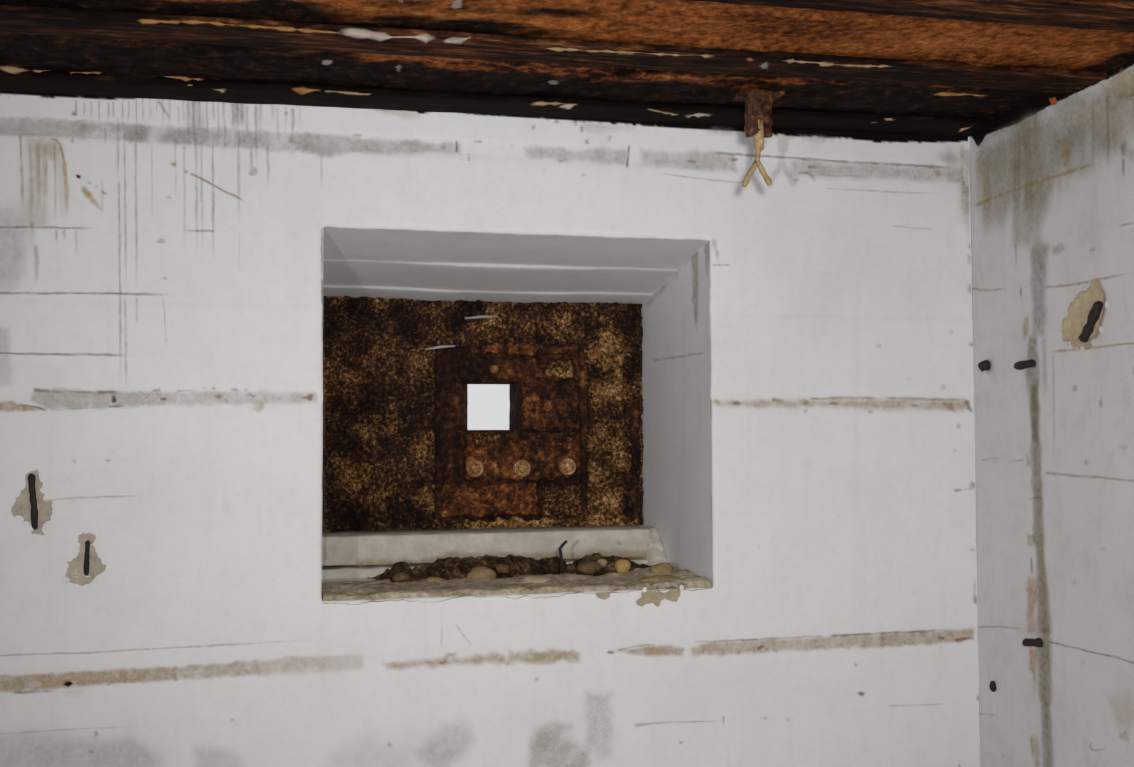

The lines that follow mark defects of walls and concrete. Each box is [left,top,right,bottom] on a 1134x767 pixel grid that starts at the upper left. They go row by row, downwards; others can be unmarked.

spalling [0,92,135,100]
spalling [476,102,745,132]
spalling [772,60,1134,146]
corrosion [323,296,640,315]
spalling [1059,281,1110,351]
spalling [11,470,52,535]
spalling [62,529,107,586]
damp [1032,380,1050,767]